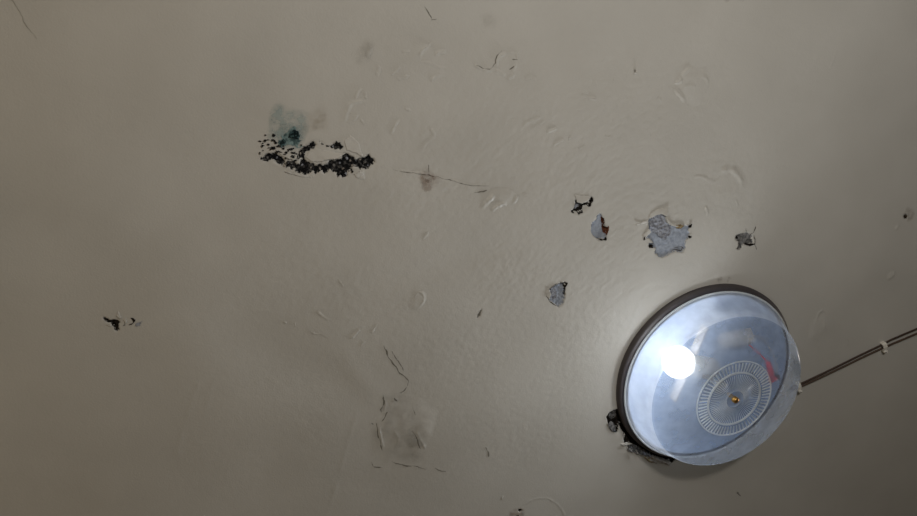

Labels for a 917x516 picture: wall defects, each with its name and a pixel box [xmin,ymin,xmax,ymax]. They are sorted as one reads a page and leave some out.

leakage [258,109,375,178]
spalling [571,195,593,214]
spalling [591,214,609,241]
spalling [636,207,692,257]
spalling [735,226,757,250]
spalling [546,282,568,307]
spalling [104,311,142,330]
spalling [606,409,675,466]